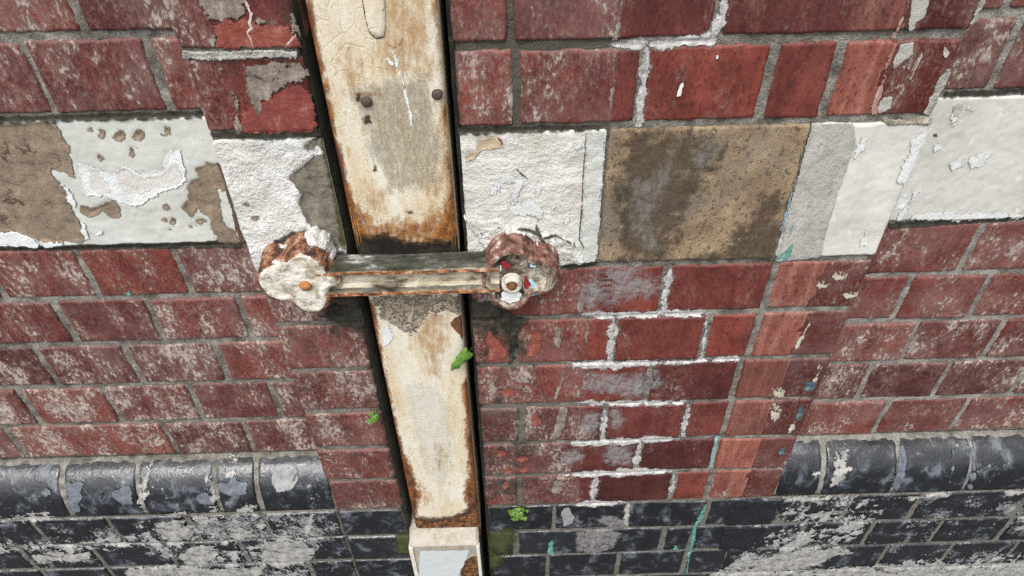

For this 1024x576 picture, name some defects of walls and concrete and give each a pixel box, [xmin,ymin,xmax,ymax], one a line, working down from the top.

peeling [0,121,241,249]
spalling [182,0,347,250]
rust [305,0,457,245]
peeling [465,137,505,162]
damp [551,44,742,526]
damp [694,191,788,261]
peeling [776,122,868,262]
peeling [877,96,1024,223]
rust [369,294,481,538]